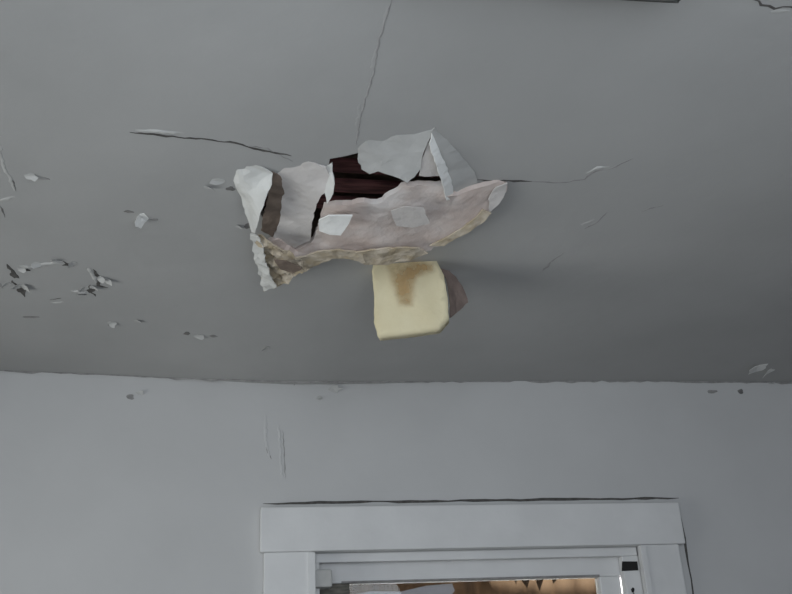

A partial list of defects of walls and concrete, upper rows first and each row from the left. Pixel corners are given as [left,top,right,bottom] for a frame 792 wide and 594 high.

crack [755,0,792,13]
crack [355,0,392,145]
crack [130,129,293,162]
spalling [333,172,441,181]
peeling [123,210,157,228]
spalling [311,208,322,237]
peeling [0,260,77,297]
peeling [71,268,112,296]
crack [263,497,677,505]
crack [681,519,694,594]